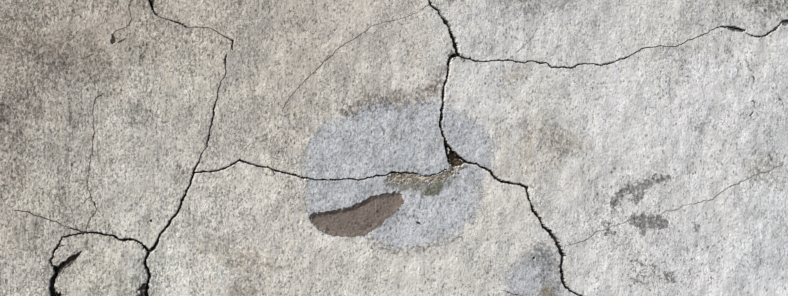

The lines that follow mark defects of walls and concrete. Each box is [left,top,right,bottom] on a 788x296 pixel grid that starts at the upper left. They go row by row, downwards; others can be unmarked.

crack [113,0,132,43]
crack [149,0,234,50]
crack [746,20,788,38]
crack [282,22,383,110]
crack [746,61,784,119]
crack [40,56,453,296]
peeling [298,97,497,254]
crack [421,0,743,296]
crack [695,164,783,204]
spalling [57,251,81,276]